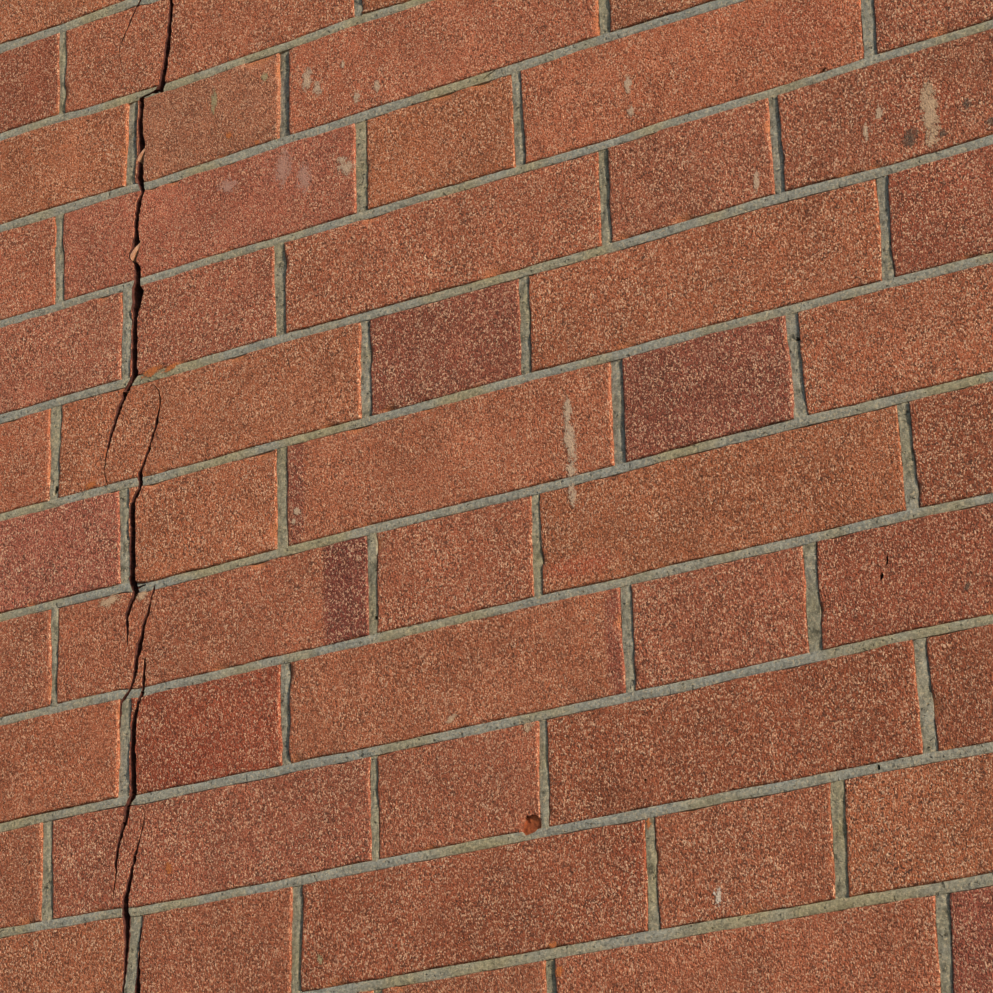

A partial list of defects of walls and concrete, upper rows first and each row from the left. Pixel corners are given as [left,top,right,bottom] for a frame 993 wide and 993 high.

crack [104,0,174,993]